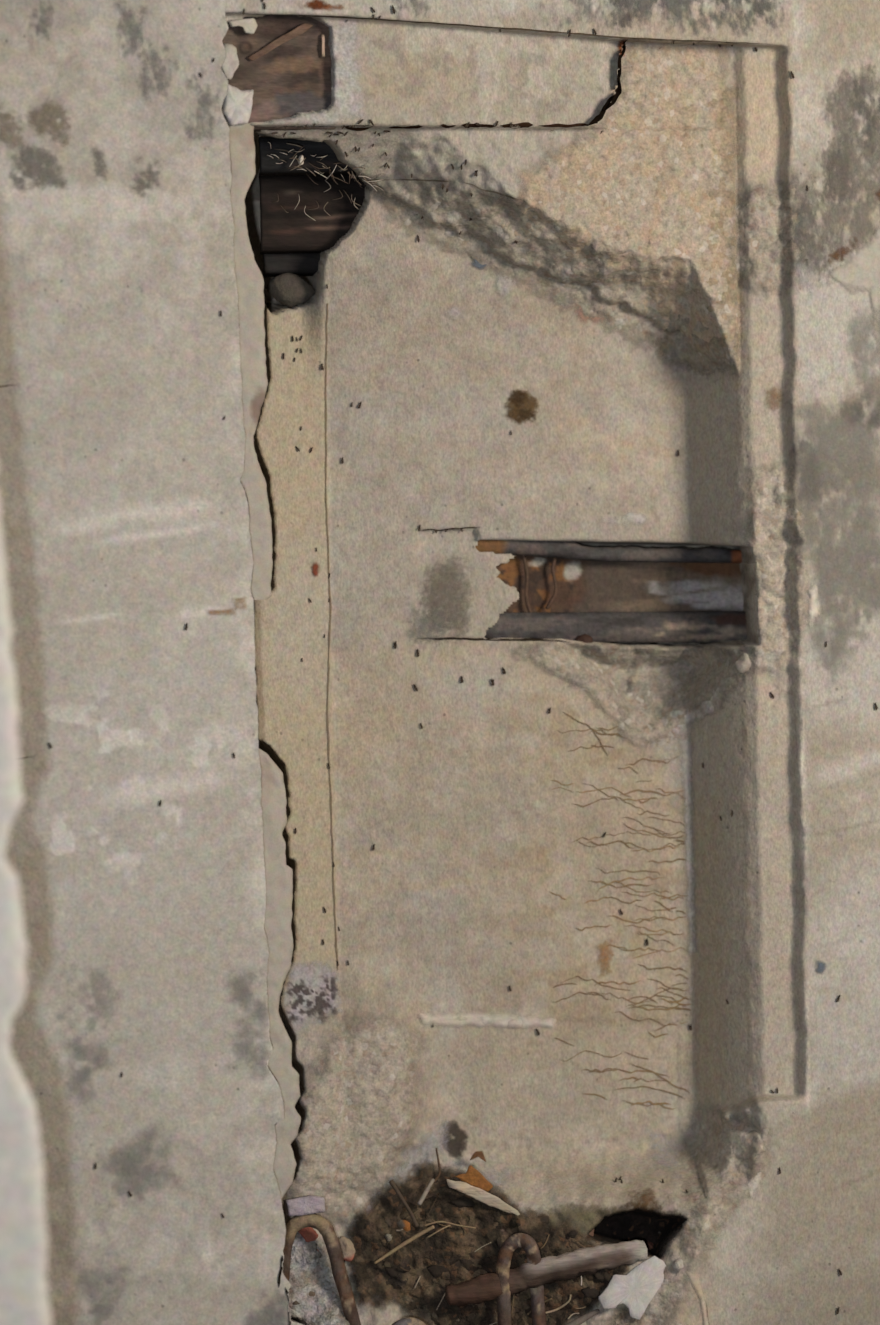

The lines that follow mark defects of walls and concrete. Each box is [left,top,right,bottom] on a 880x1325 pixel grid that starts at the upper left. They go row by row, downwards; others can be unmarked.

crack [372,179,520,200]
crack [222,13,777,131]
spalling [363,40,797,373]
water stain [611,0,773,31]
water stain [791,66,880,284]
crack [420,525,478,533]
crack [417,635,567,643]
spalling [515,464,819,746]
water stain [800,403,880,665]
crack [549,713,691,1109]
crack [278,1255,291,1325]
spalling [640,1105,770,1325]